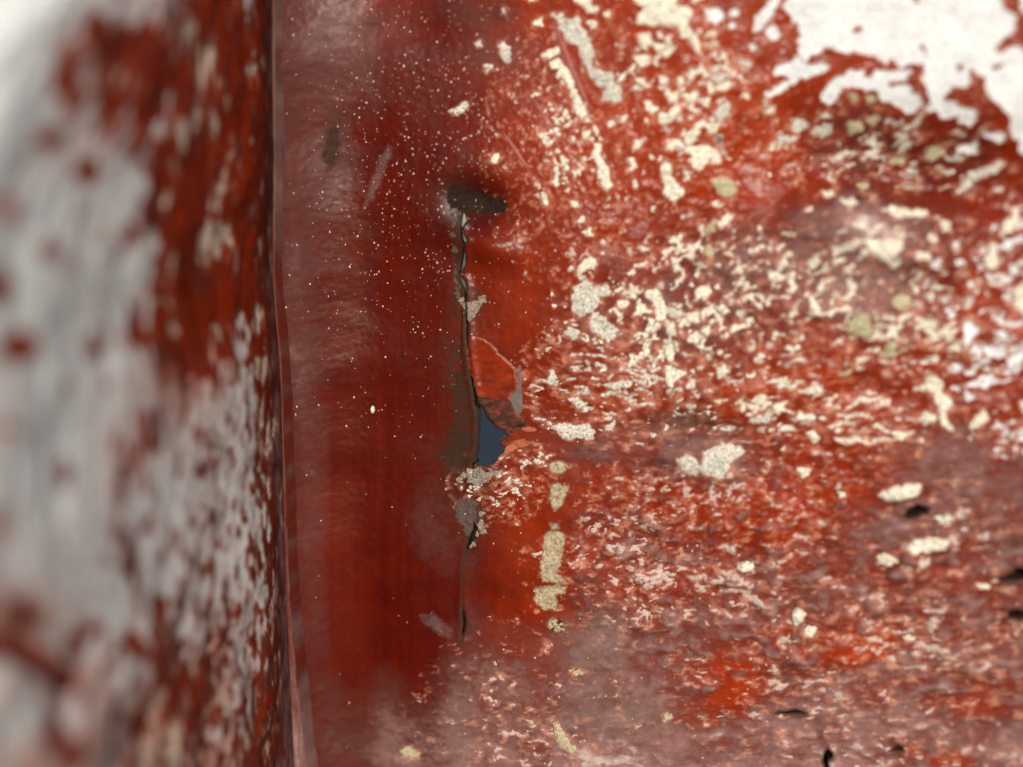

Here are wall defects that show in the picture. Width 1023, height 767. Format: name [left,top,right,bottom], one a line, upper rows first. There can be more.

crack [459,211,468,344]
crack [471,376,479,406]
crack [467,522,477,549]
peeling [819,575,1006,683]
peeling [400,746,421,759]
peeling [475,661,595,767]
peeling [743,658,860,739]
spalling [817,747,860,767]
peeling [865,689,923,767]
peeling [942,745,985,767]